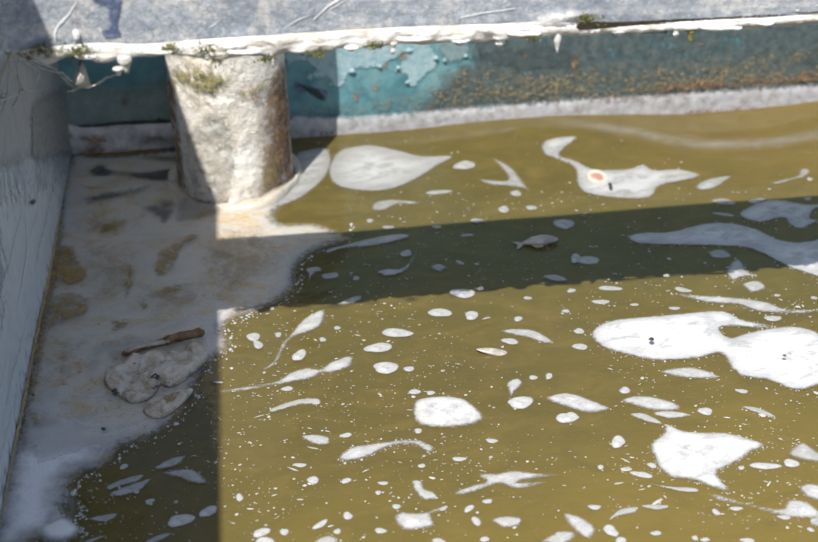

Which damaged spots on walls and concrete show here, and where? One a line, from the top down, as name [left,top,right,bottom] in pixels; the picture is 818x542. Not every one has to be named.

rust [252,67,294,193]
peeling [285,42,470,87]
leakage [0,1,818,166]